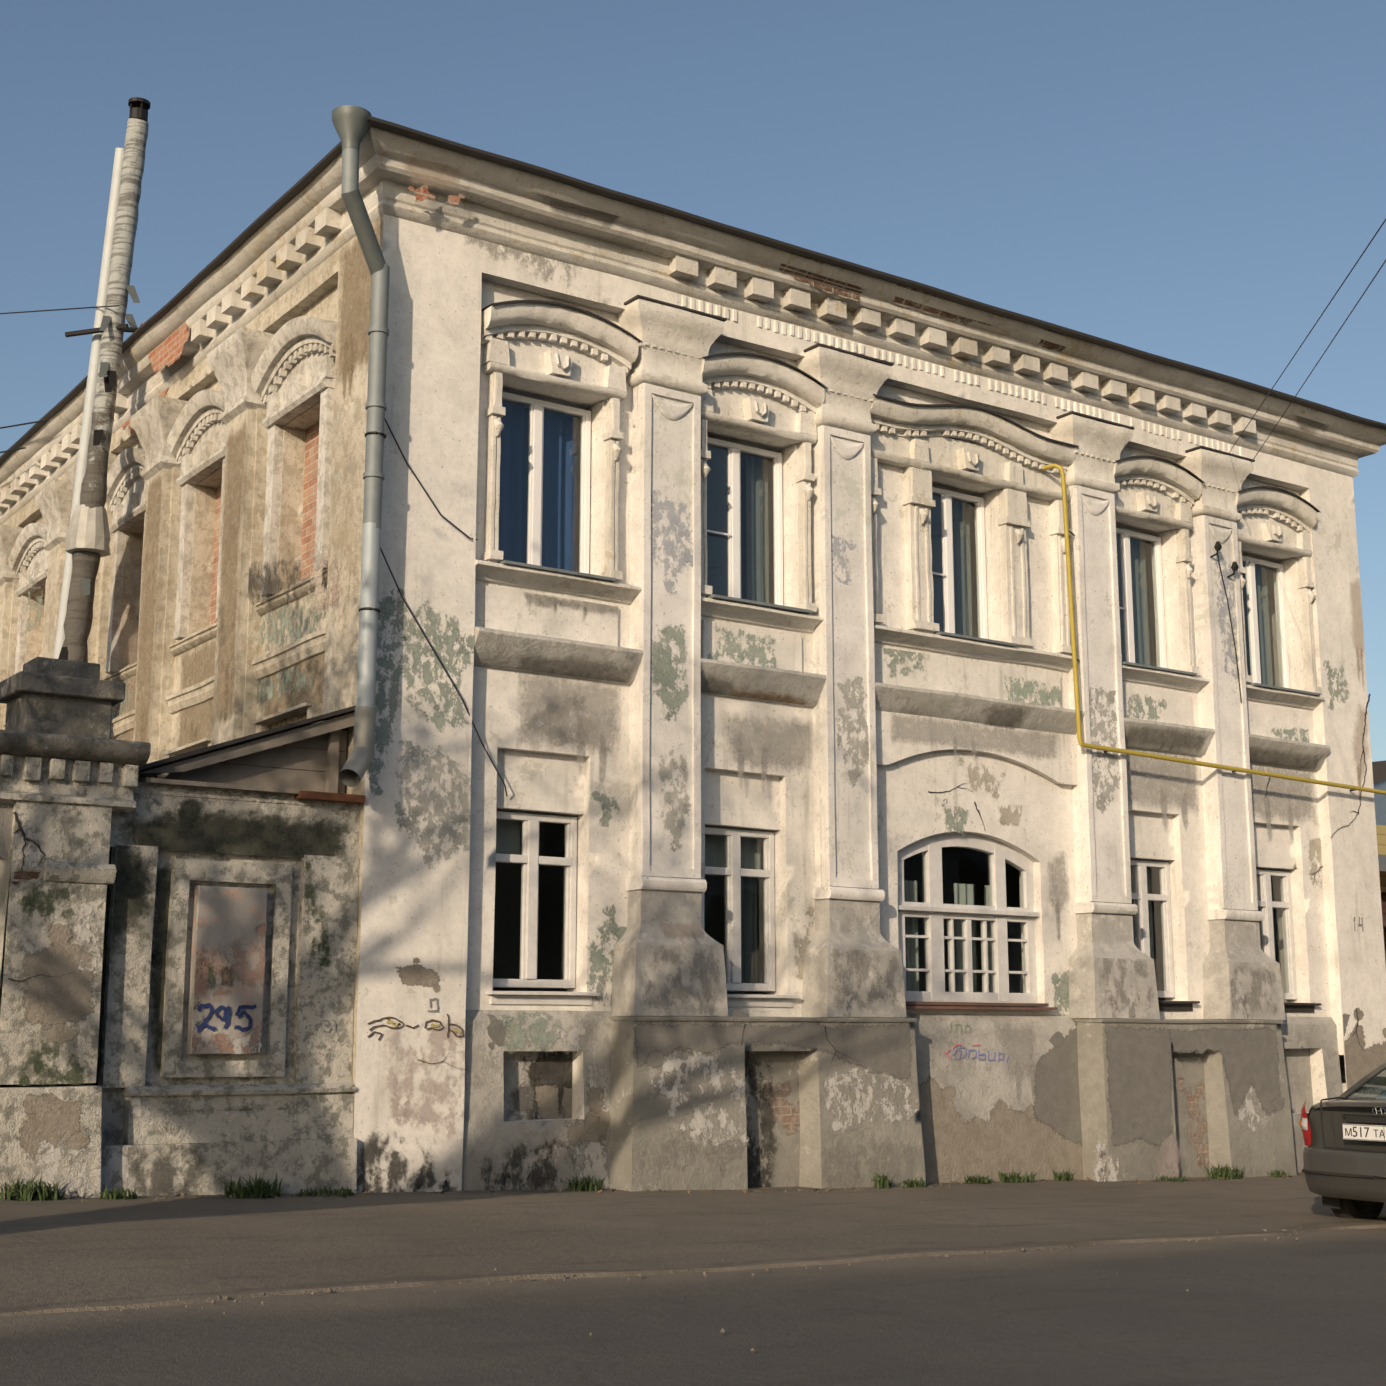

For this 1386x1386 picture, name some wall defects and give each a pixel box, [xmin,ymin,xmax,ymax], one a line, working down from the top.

spalling [147,322,190,372]
peeling [647,1050,800,1147]
spalling [824,971,1125,1183]